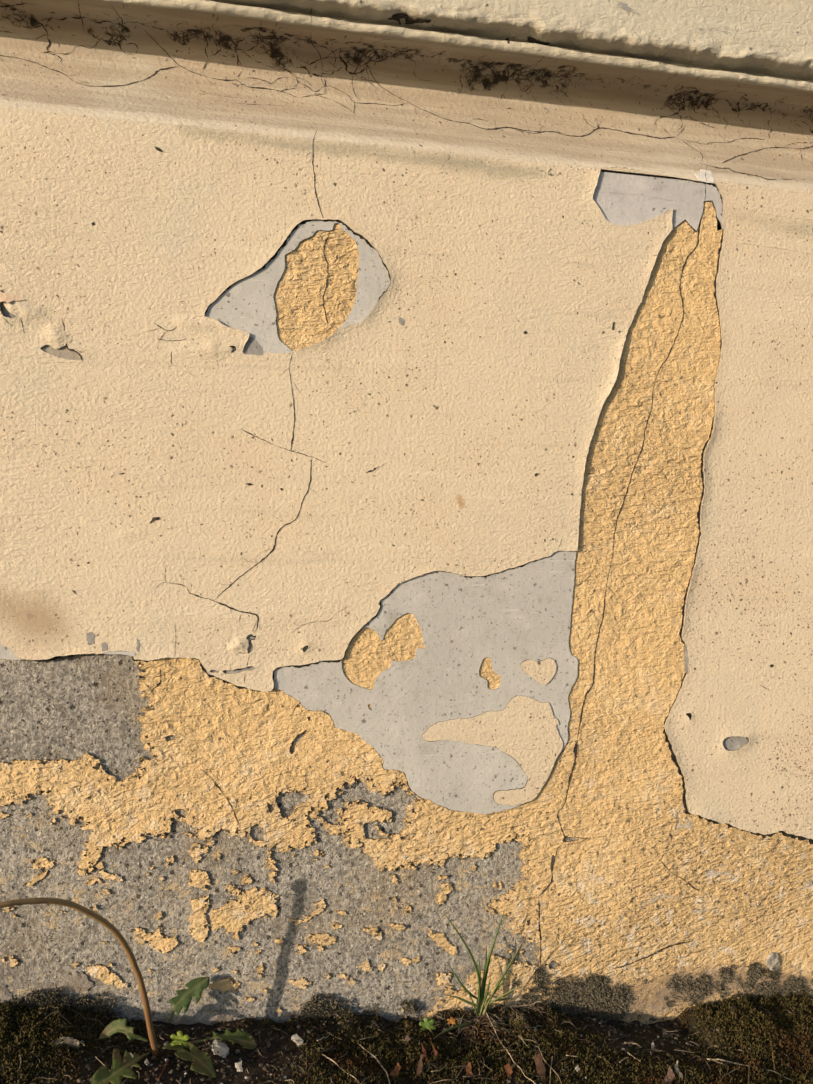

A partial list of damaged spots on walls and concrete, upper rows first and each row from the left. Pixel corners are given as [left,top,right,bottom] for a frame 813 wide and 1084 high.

water stain [0,3,434,94]
crack [0,32,813,200]
water stain [459,54,582,112]
water stain [654,85,813,138]
crack [306,131,329,323]
crack [148,316,236,376]
crack [153,356,326,683]
peeling [0,166,813,1024]
crack [518,216,702,965]